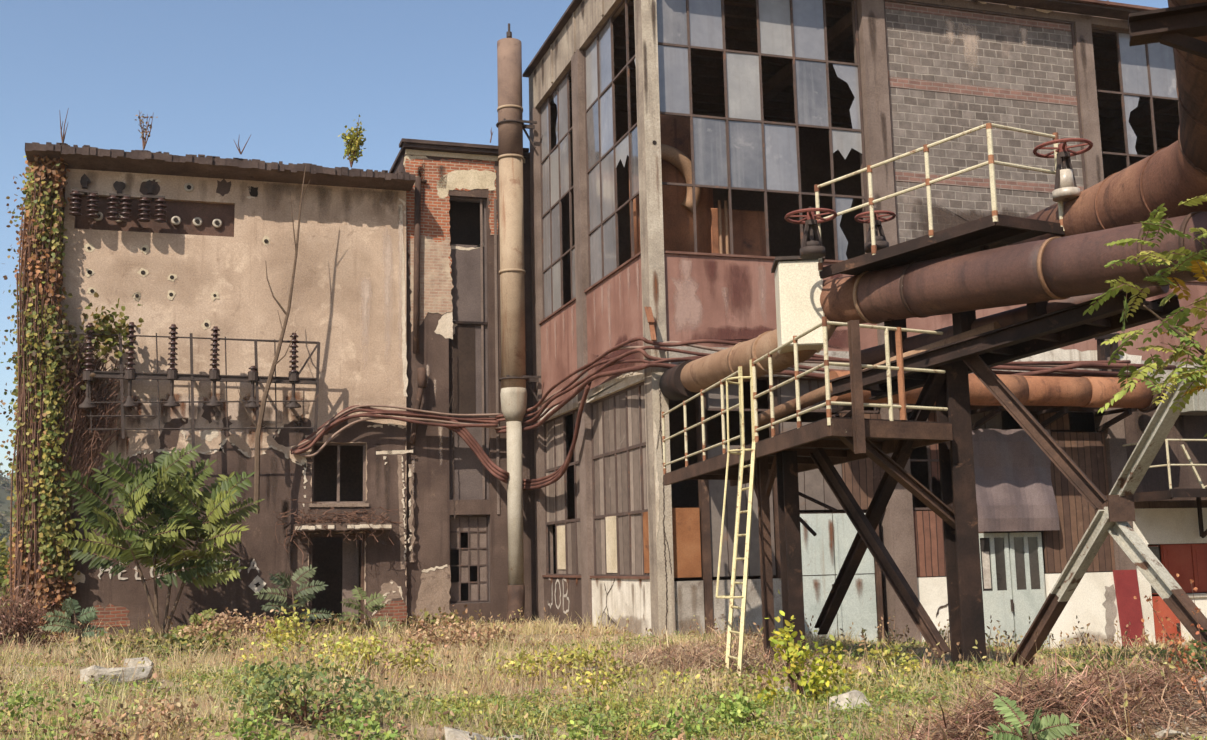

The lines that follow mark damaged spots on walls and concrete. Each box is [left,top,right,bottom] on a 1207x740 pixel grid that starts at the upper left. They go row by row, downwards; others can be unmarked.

flaking render [398,155,498,396]
leakage [674,260,701,328]
rust [708,261,748,307]
rust [710,327,773,346]
rust [828,330,847,348]
peeling [62,398,451,638]